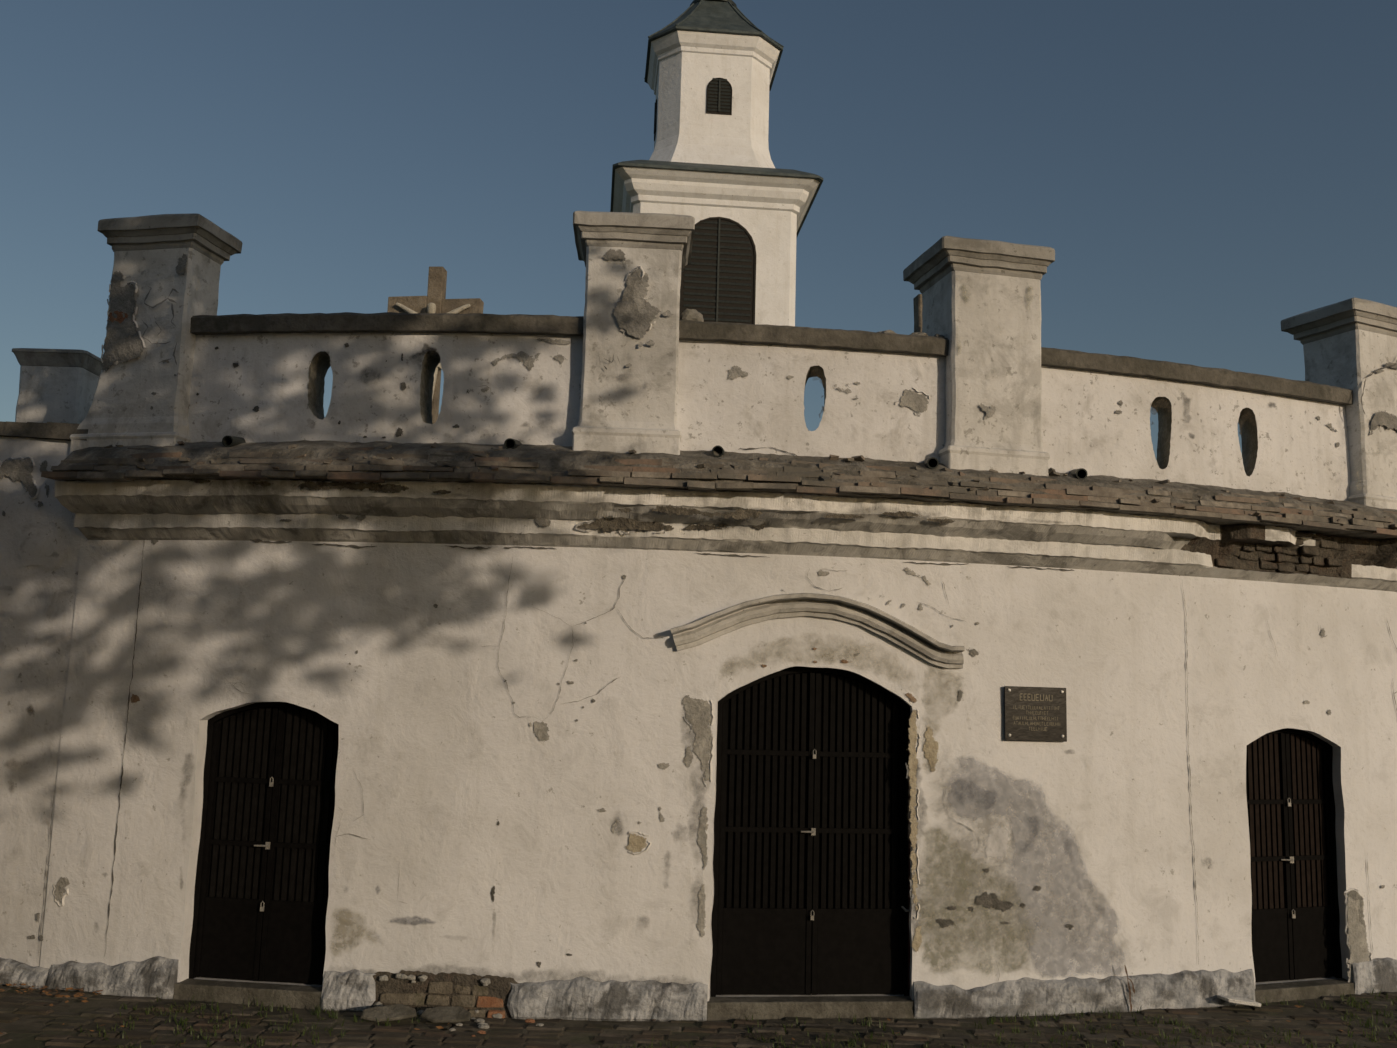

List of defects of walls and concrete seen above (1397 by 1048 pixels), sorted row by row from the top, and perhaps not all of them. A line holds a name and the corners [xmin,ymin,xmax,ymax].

flaking render [101,271,146,372]
flaking render [603,249,673,348]
peeling [1370,411,1397,435]
peeling [0,456,49,507]
crack [445,545,649,720]
crack [105,546,144,952]
flaking render [658,695,715,787]
flaking render [697,806,708,937]
peeling [905,693,1041,952]
flaking render [1344,888,1372,982]
flaking render [373,970,519,1018]